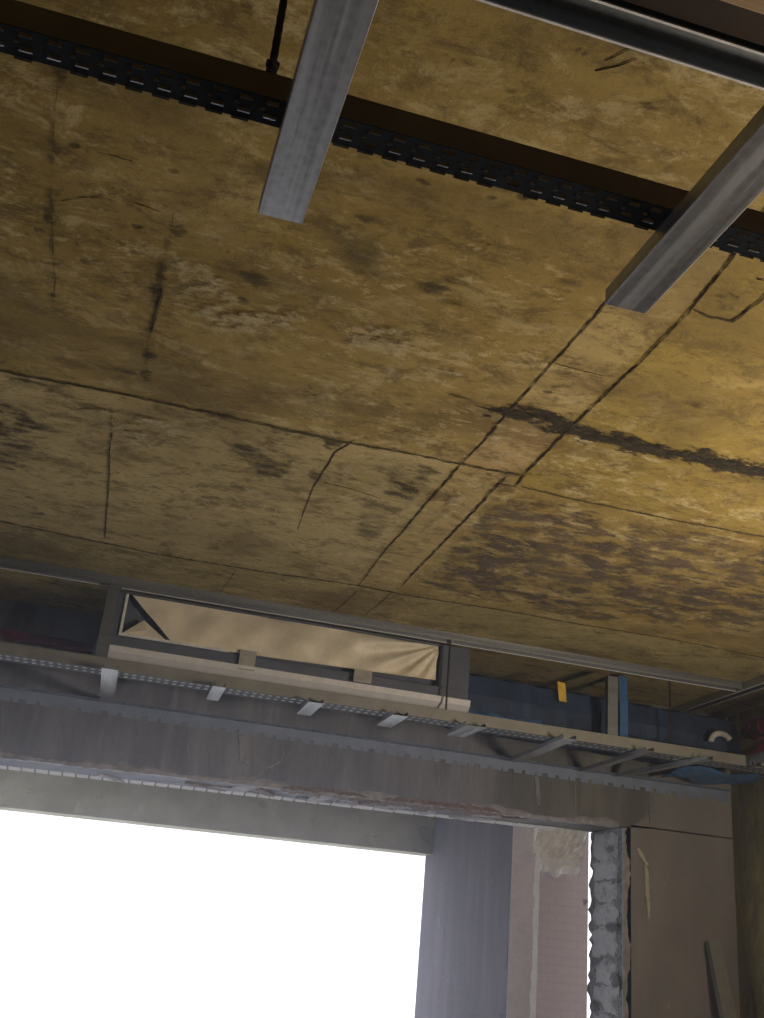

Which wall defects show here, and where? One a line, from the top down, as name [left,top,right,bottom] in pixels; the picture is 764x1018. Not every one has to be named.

water stain [0,404,55,470]
crack [0,189,764,658]
water stain [422,497,764,632]